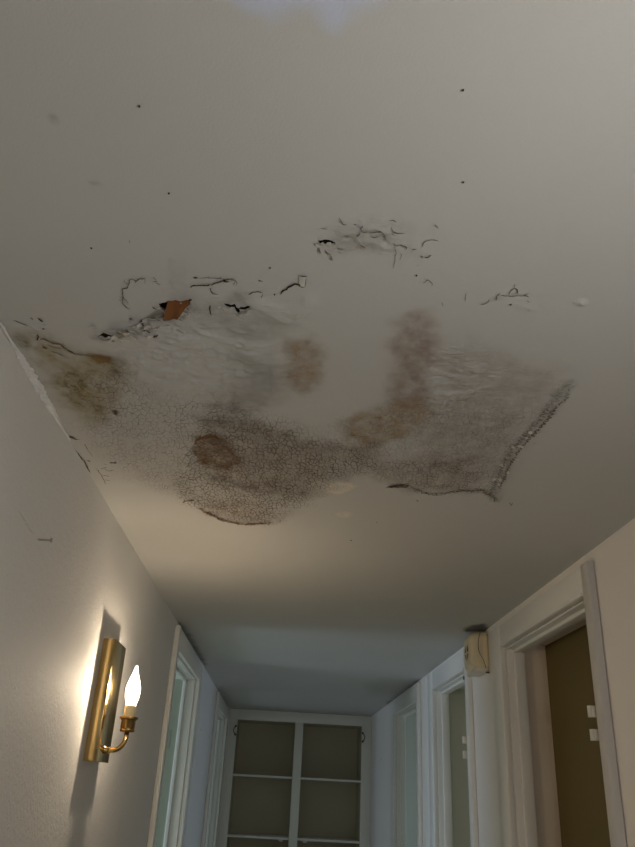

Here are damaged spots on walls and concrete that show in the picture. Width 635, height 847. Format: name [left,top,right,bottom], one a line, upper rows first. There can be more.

crack [121,276,160,338]
crack [14,317,90,358]
crack [69,436,117,484]
crack [174,414,373,526]
crack [389,463,513,505]